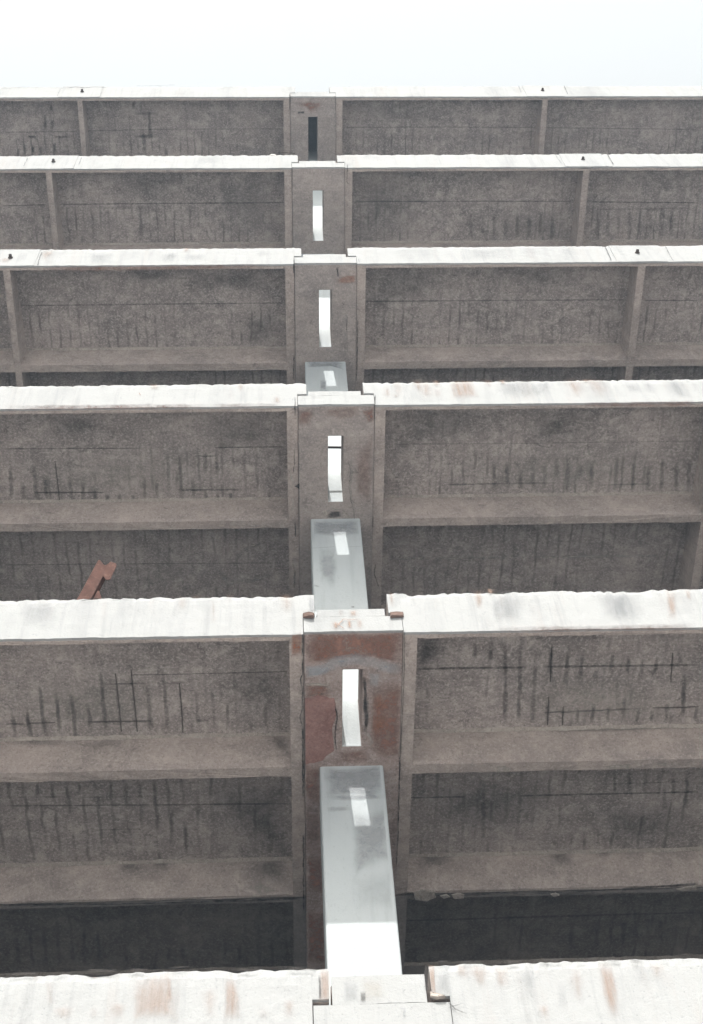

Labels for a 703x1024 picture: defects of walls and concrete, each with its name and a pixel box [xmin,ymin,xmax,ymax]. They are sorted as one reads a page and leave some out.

rust [313,606,395,661]
rust [309,861,321,889]
rust [308,913,324,961]